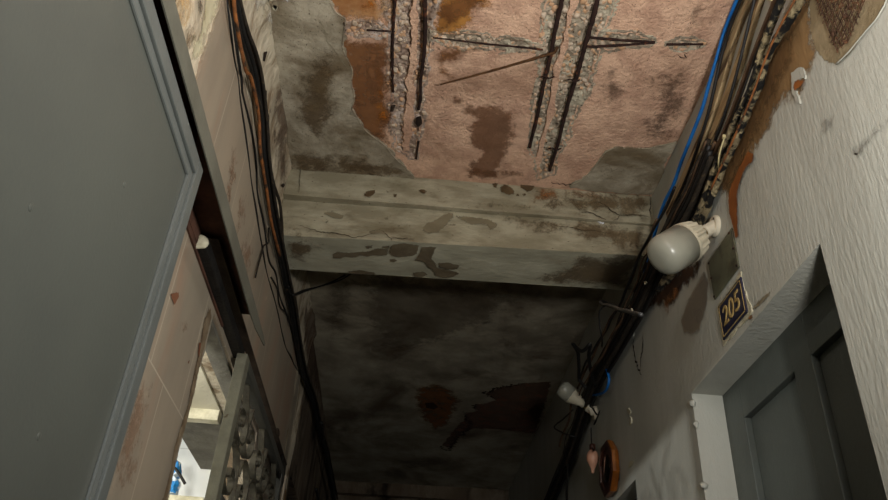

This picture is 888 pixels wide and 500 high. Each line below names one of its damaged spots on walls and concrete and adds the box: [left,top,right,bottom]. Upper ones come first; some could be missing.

corrosion [331,0,387,23]
corrosion [434,0,490,34]
damp [297,60,336,136]
damp [274,89,401,178]
corrosion [344,38,395,144]
damp [437,49,467,76]
flaking render [263,0,707,196]
damp [454,97,517,178]
peeling [791,67,807,104]